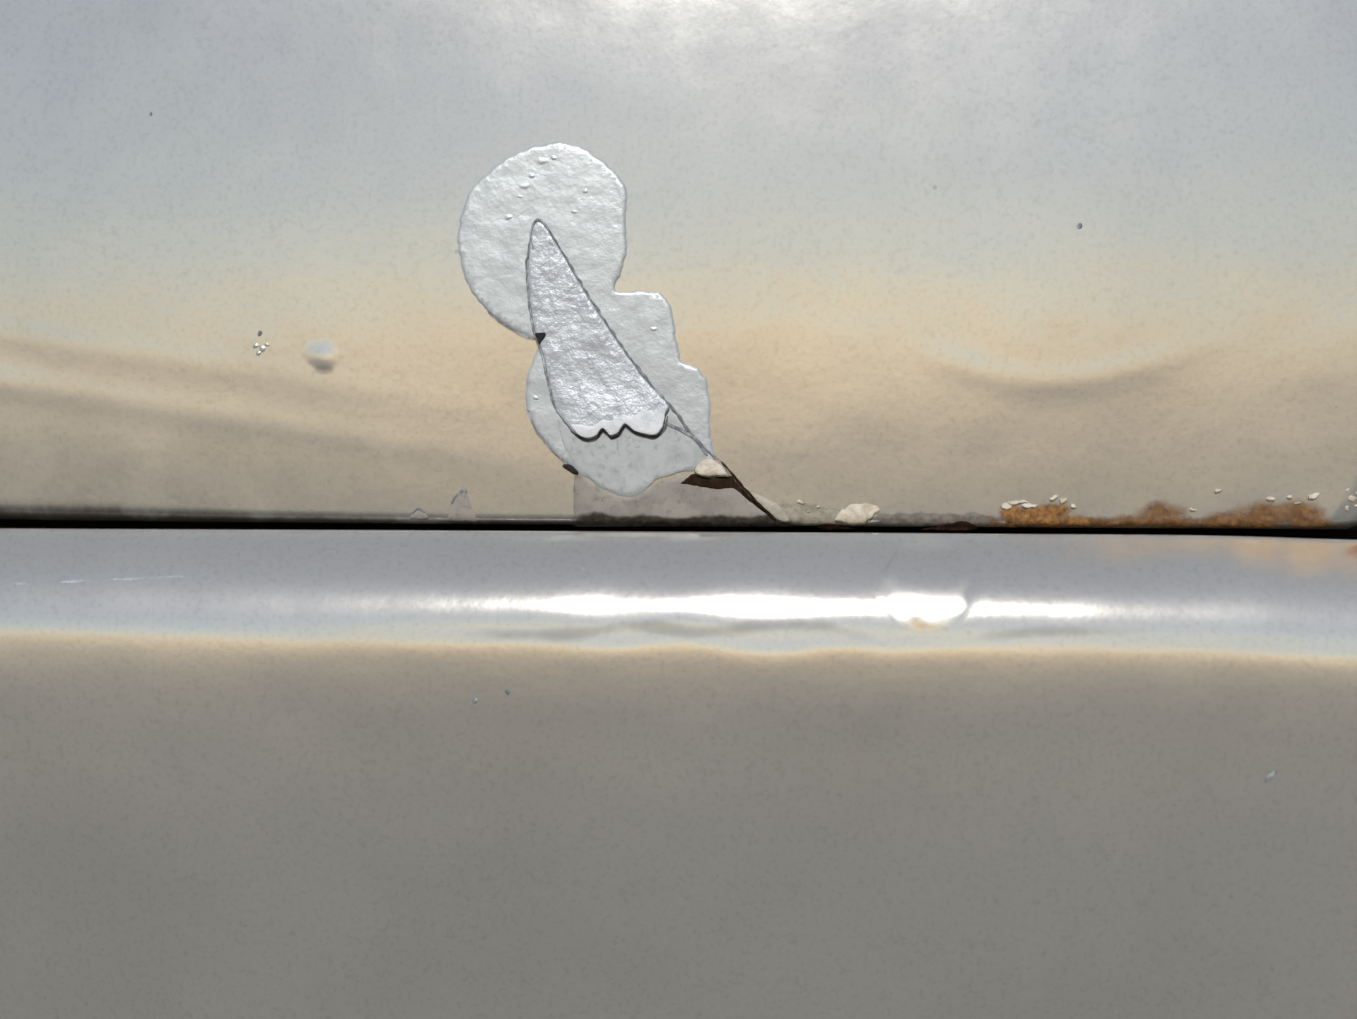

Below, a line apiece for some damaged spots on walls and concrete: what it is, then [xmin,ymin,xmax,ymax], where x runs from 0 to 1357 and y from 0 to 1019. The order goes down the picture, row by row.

peeling [457,141,991,531]
peeling [448,488,477,522]
corrosion [987,493,1331,528]